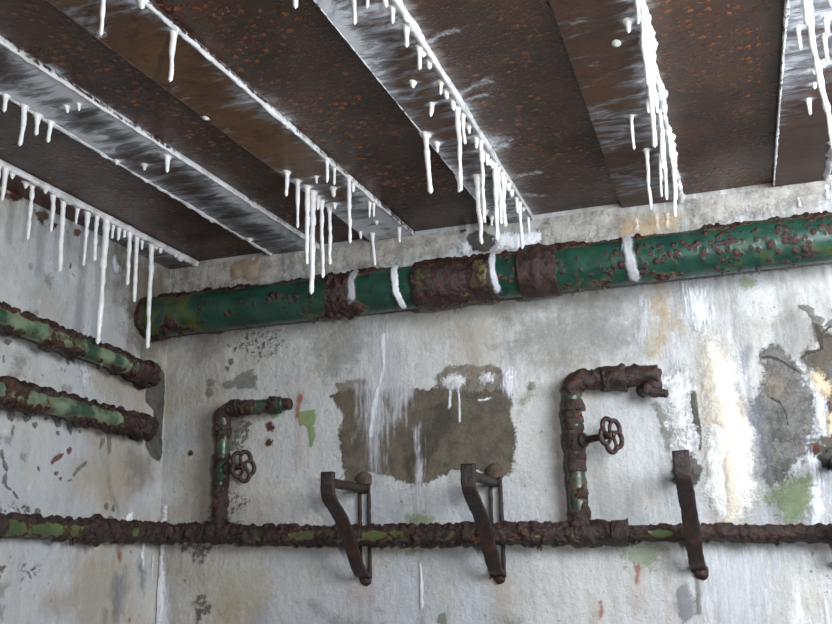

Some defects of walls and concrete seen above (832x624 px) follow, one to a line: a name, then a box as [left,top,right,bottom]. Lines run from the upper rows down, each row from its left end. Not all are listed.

leakage [0,0,320,266]
leakage [138,0,422,236]
leakage [388,0,543,220]
leakage [633,0,686,203]
leakage [772,0,790,187]
leakage [115,245,169,317]
leakage [359,314,413,471]
leakage [413,429,423,514]
leakage [458,239,473,256]
leakage [489,230,542,293]
flaking render [750,344,820,486]
flaking render [798,305,832,327]